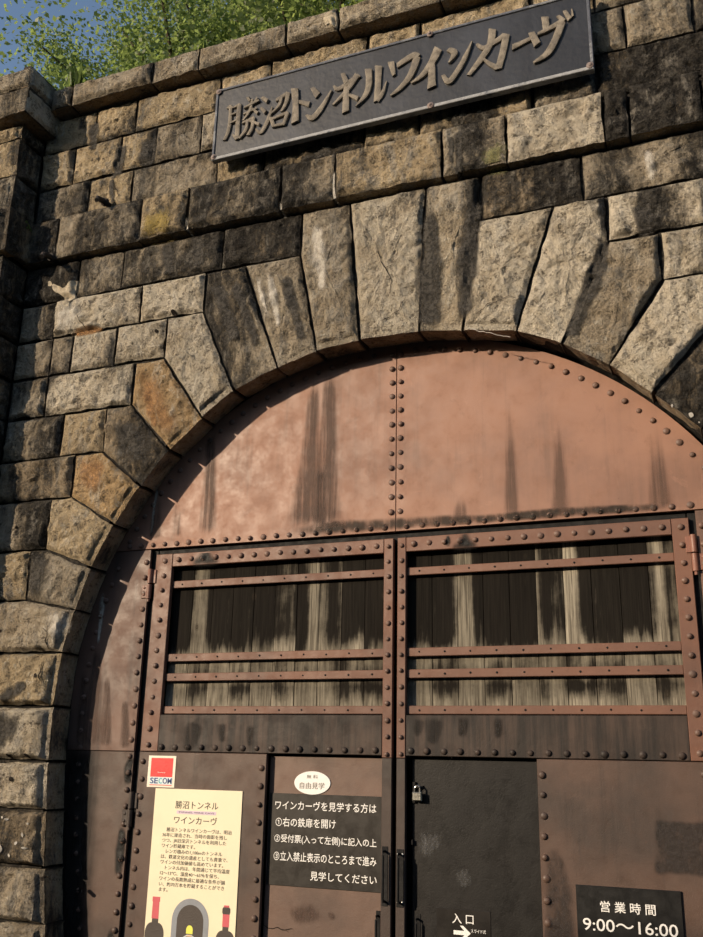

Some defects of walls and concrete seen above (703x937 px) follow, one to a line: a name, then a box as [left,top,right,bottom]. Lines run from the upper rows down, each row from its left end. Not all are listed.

damp [109,146,126,203]
damp [138,139,156,166]
crack [378,252,406,332]
damp [416,212,441,325]
damp [455,202,481,317]
damp [566,245,608,336]
damp [203,439,214,529]
damp [294,382,336,523]